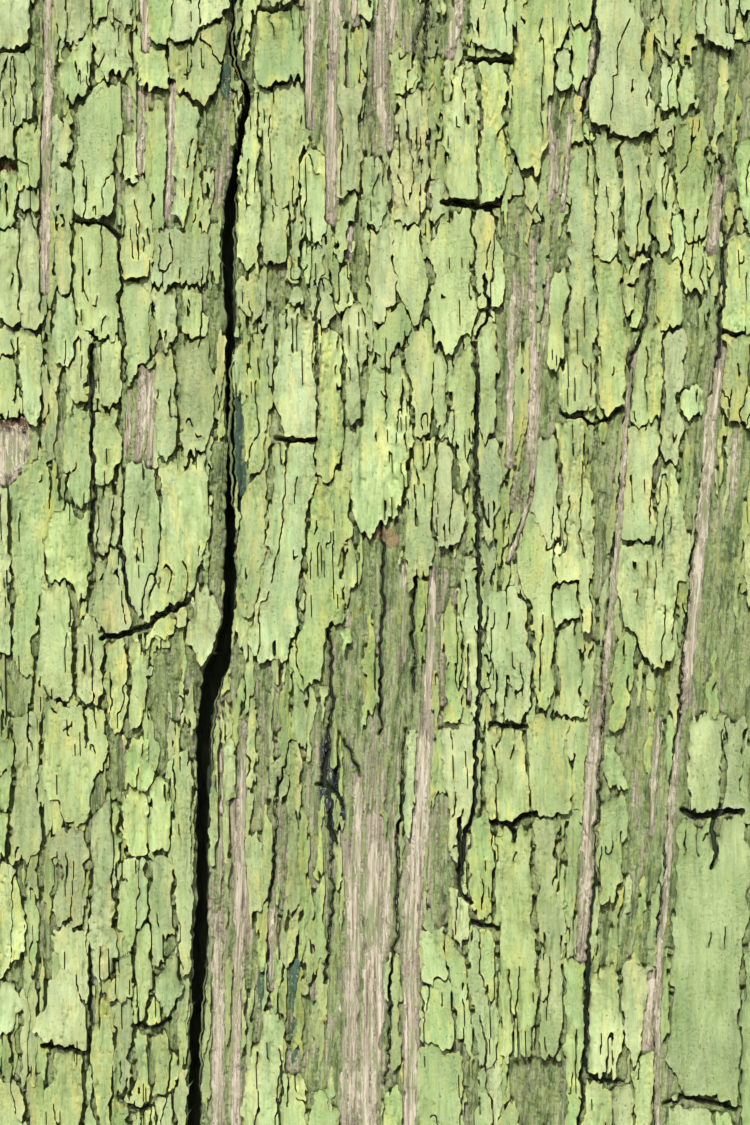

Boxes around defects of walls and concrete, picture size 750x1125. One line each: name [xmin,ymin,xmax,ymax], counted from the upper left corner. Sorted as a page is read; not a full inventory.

peeling [0,0,230,1125]
crack [121,1098,150,1110]
crack [135,0,251,1125]
crack [267,768,284,960]
peeling [201,0,750,1125]
crack [652,465,741,1125]
crack [710,158,742,395]